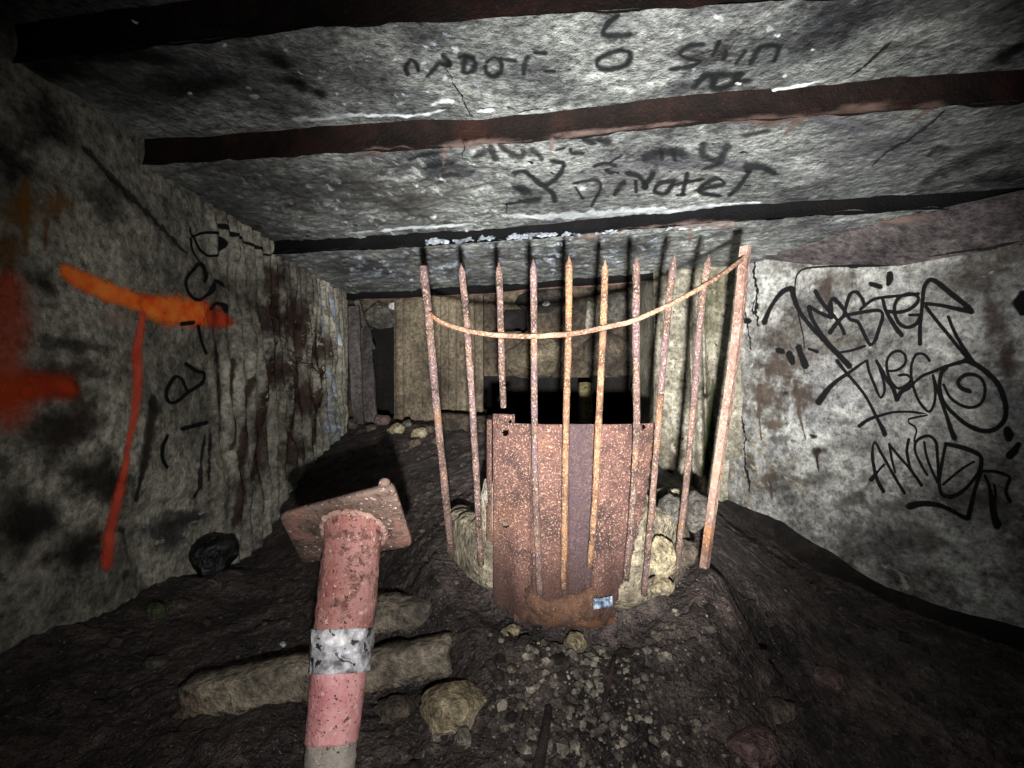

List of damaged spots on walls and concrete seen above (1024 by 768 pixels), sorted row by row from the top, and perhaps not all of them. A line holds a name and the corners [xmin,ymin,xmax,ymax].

crack [445,68,551,158]
leakage [324,370,344,442]
leakage [752,354,816,442]
crack [741,416,751,493]